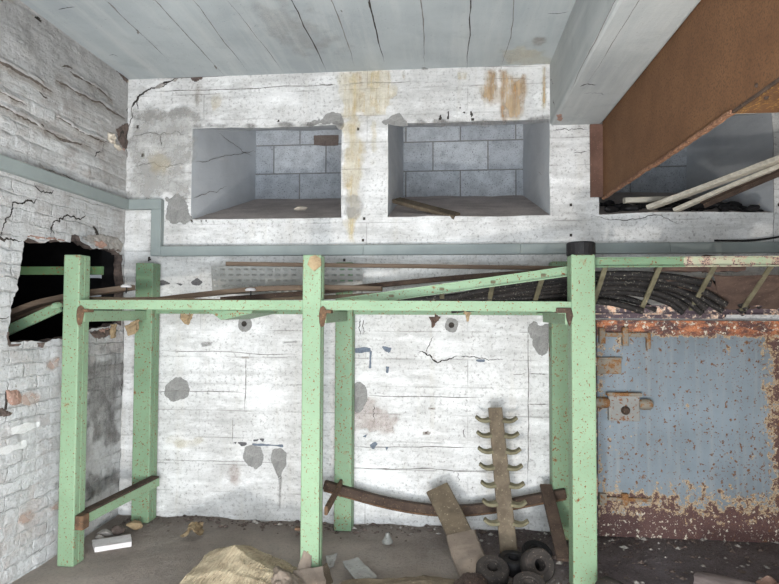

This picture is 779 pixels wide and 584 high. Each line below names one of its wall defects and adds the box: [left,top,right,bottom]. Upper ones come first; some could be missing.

crack [291,0,324,65]
crack [368,0,384,59]
crack [465,0,473,55]
rust [483,72,522,117]
crack [126,78,184,168]
crack [0,183,54,242]
crack [50,213,85,235]
spalling [90,328,110,339]
crack [420,336,503,363]
spalling [0,385,35,417]